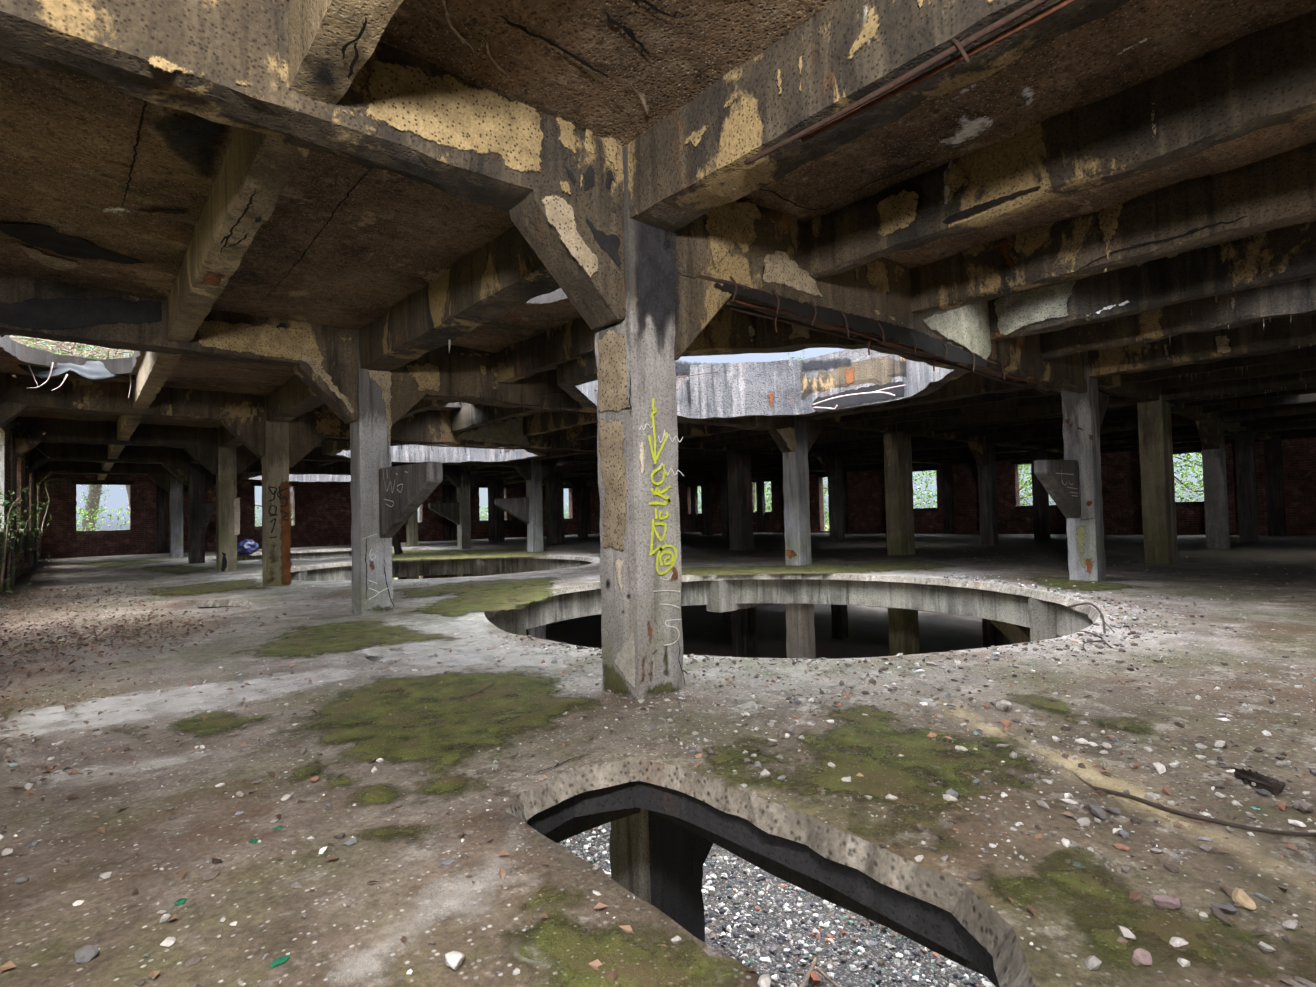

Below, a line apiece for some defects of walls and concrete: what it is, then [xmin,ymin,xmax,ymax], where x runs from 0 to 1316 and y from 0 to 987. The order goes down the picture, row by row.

peeling [148,56,204,75]
crack [342,17,367,79]
crack [498,15,614,79]
crack [604,0,677,55]
peeling [848,5,880,59]
peeling [343,59,618,172]
peeling [683,125,709,147]
peeling [542,175,598,278]
peeling [876,189,919,237]
spalling [943,184,1050,224]
peeling [1097,198,1130,273]
spalling [705,201,989,367]